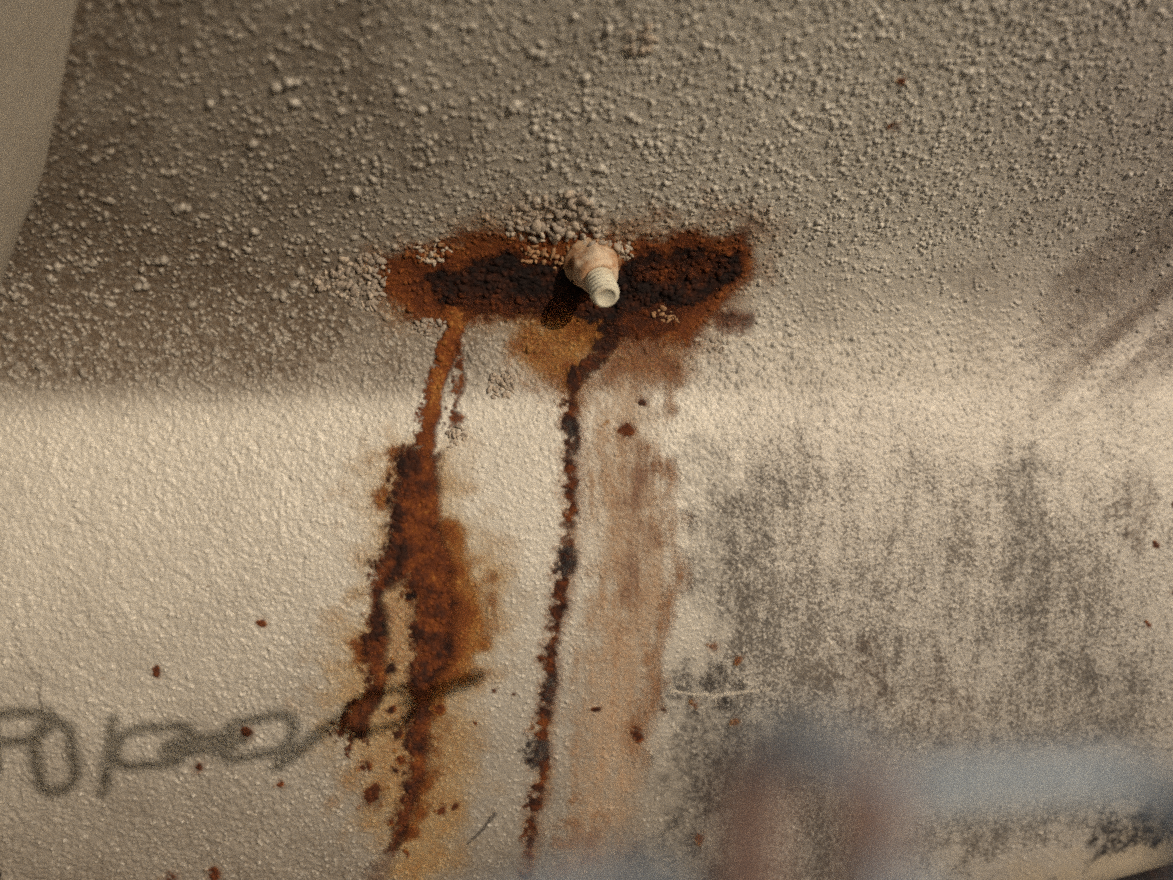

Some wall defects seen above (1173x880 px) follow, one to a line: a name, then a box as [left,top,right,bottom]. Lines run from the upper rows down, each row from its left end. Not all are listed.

corrosion [327,229,755,880]
damp [1089,812,1162,859]